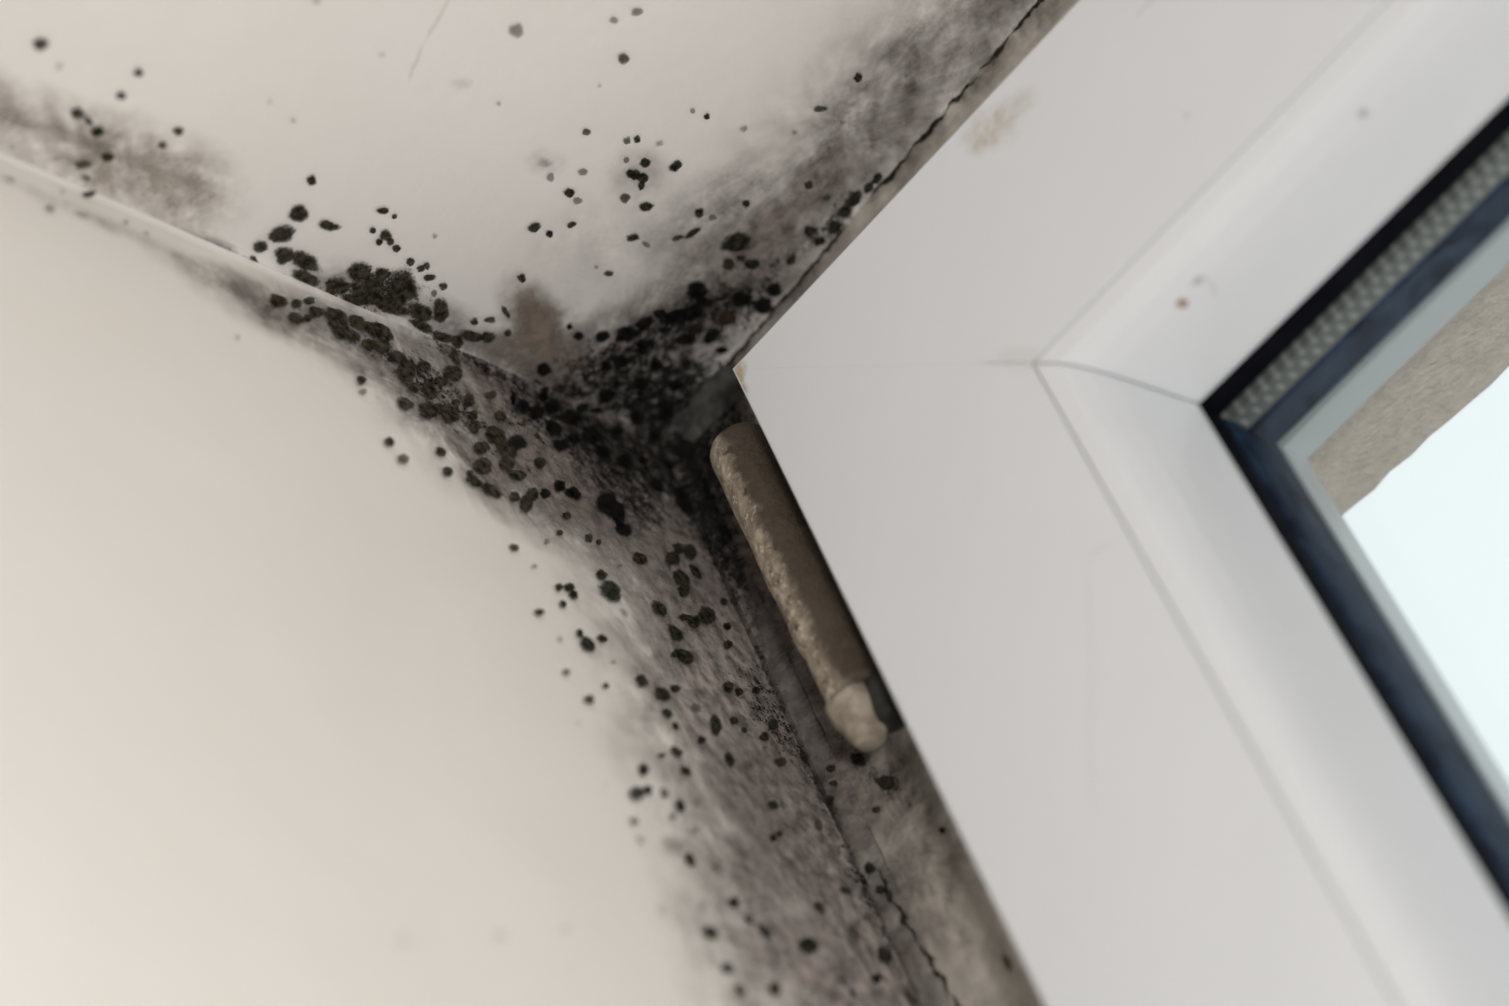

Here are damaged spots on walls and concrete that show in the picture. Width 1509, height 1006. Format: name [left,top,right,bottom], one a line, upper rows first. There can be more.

damp [32,38,49,50]
damp [51,108,212,210]
damp [205,0,1025,1006]